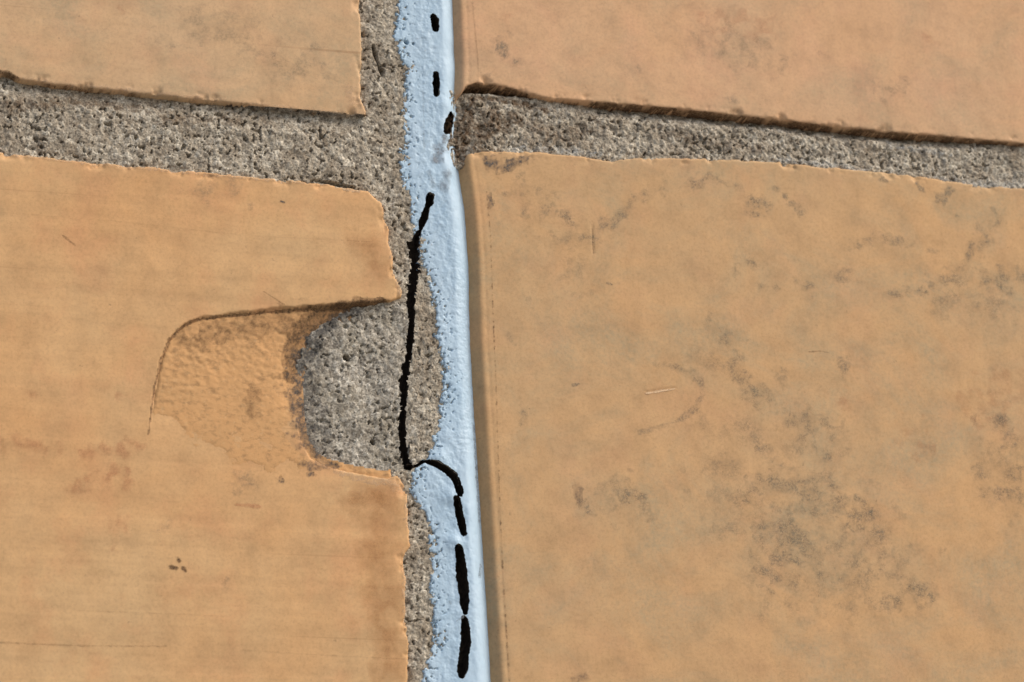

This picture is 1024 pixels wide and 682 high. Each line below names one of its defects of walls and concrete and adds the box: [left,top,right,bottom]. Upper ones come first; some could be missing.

spalling [147,274,421,485]
crack [398,193,472,679]